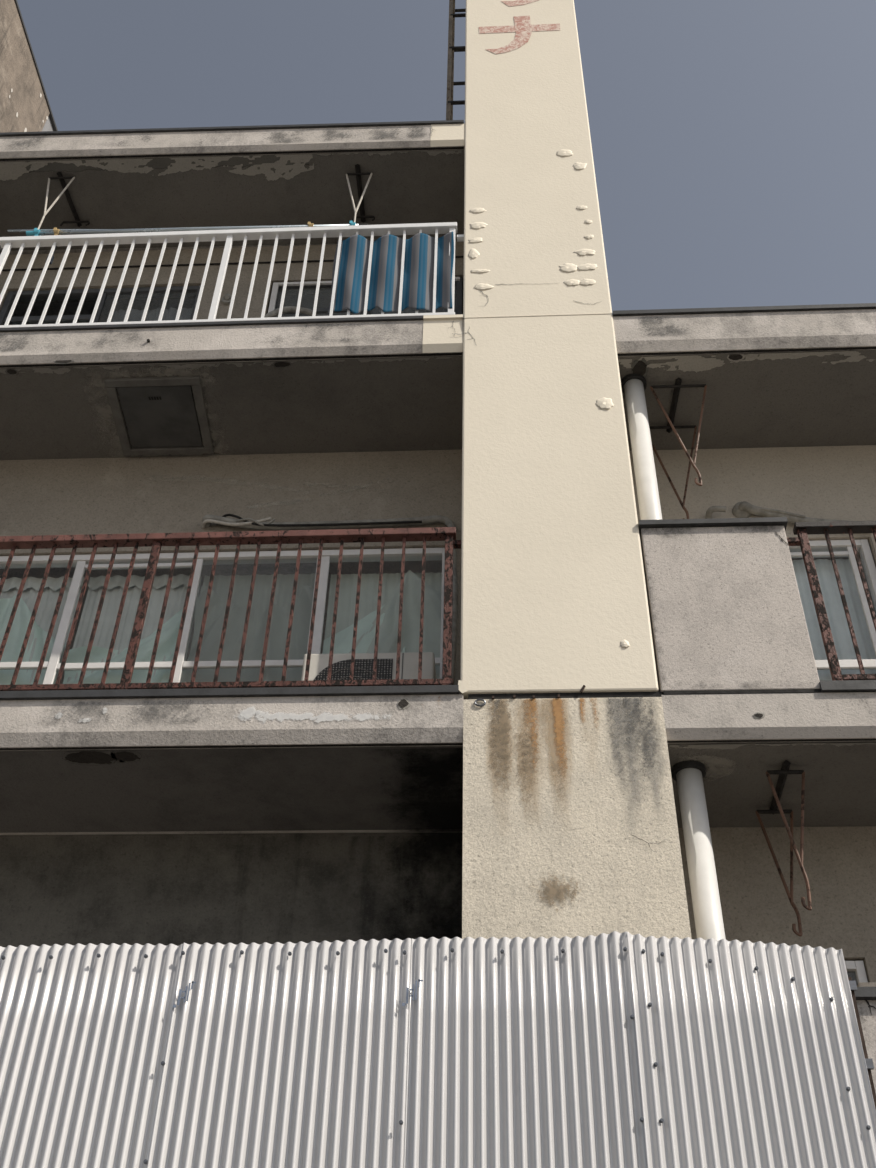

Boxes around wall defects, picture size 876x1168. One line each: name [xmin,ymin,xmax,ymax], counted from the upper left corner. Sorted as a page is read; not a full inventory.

peeling [0,154,314,181]
peeling [618,351,876,378]
rust [552,698,567,768]